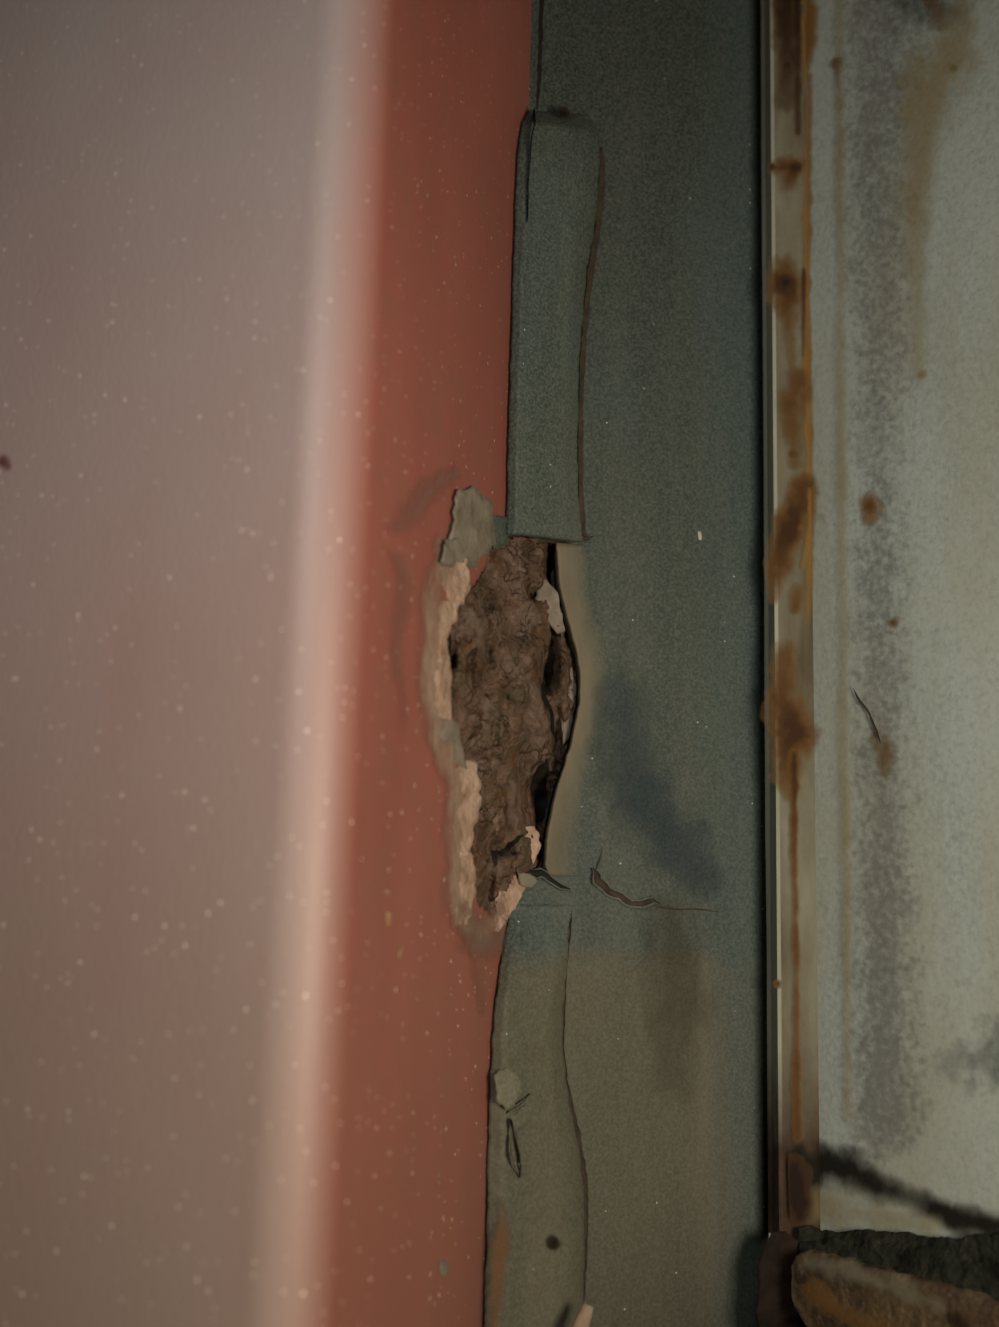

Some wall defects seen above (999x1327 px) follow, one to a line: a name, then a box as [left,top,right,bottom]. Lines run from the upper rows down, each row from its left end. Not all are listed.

corrosion [767,0,818,613]
corrosion [863,495,878,522]
spalling [420,537,611,943]
crack [516,848,718,912]
corrosion [769,647,815,1141]
corrosion [789,1157,811,1225]